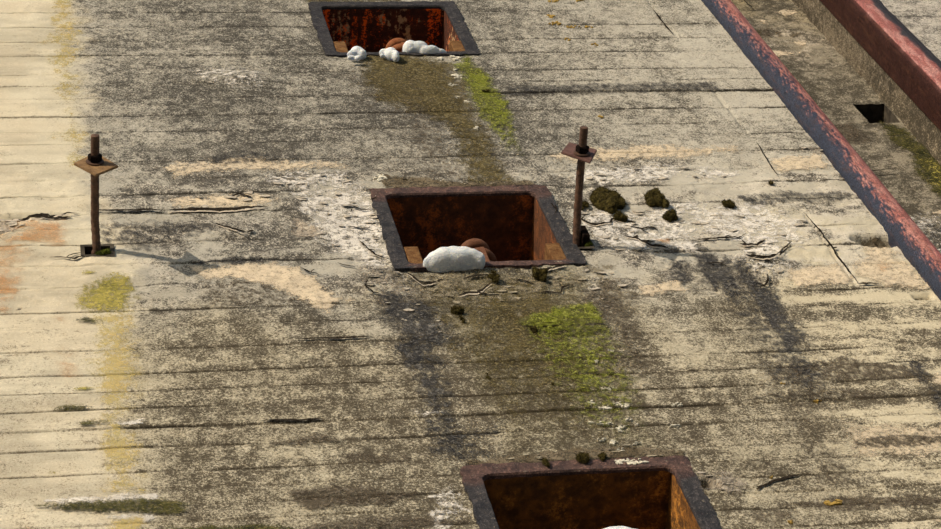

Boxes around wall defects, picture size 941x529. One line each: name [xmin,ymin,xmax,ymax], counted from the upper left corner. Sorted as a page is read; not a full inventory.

water stain [350,55,514,187]
crack [0,191,264,234]
crack [807,216,877,284]
water stain [371,269,647,458]
water stain [667,245,850,486]